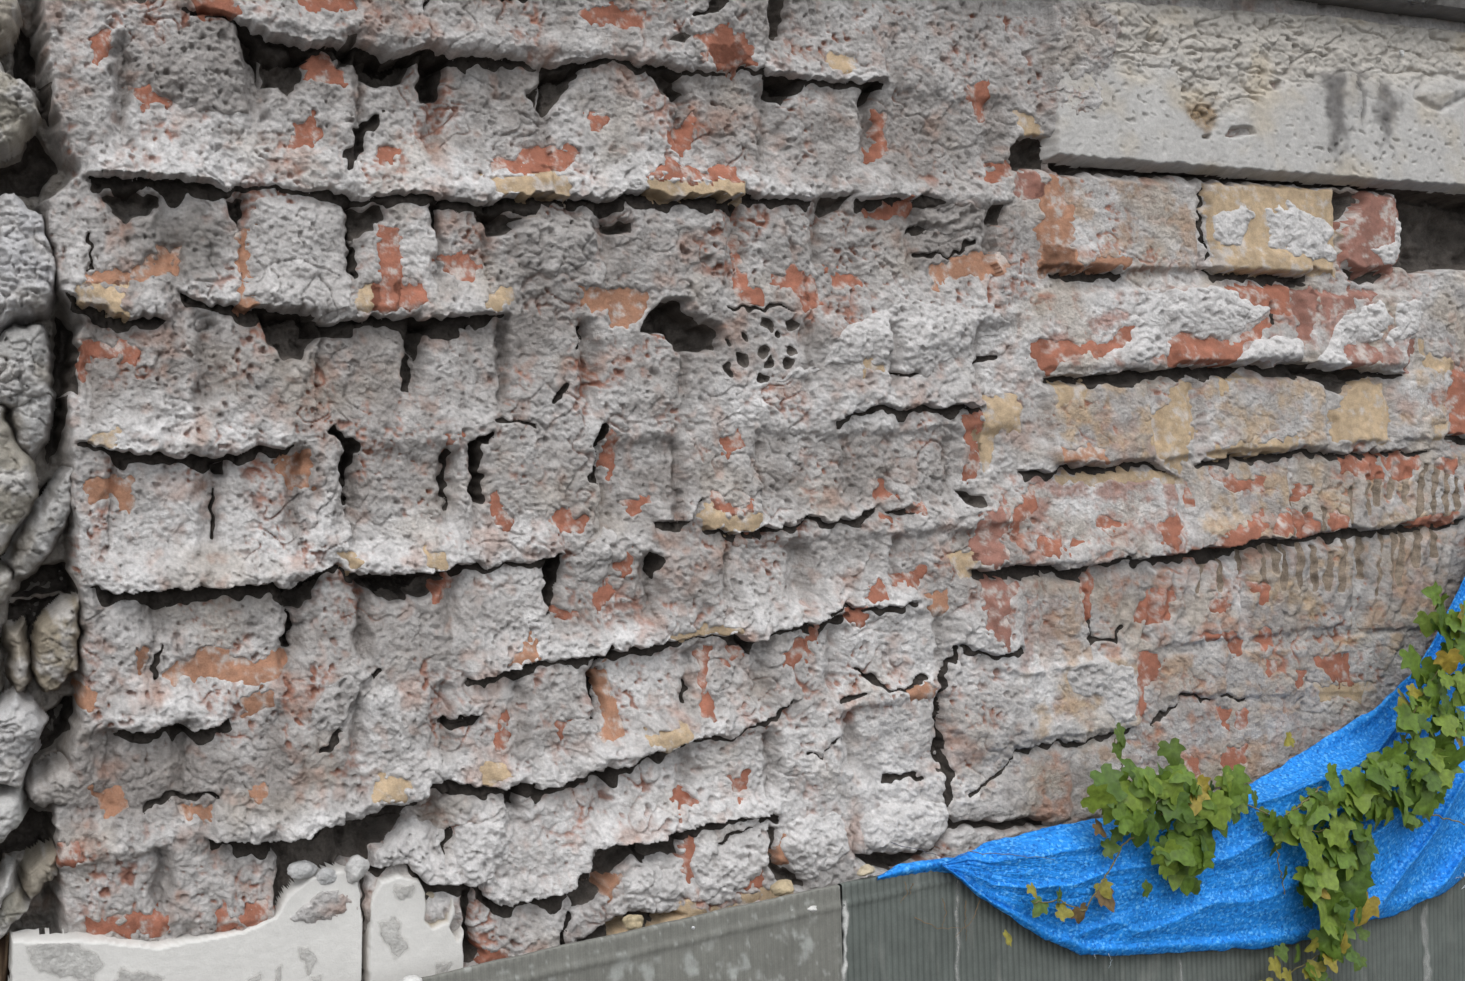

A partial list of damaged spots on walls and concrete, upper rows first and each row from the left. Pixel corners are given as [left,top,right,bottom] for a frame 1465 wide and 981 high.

crack [342,110,385,170]
leakage [1327,73,1364,148]
leakage [1381,86,1397,134]
spalling [979,160,1133,279]
crack [327,425,361,505]
crack [436,383,569,511]
spalling [843,182,1465,653]
crack [541,553,562,615]
spalling [1135,651,1165,717]
spalling [1195,626,1277,678]
spalling [1295,652,1372,705]
crack [806,645,1018,807]